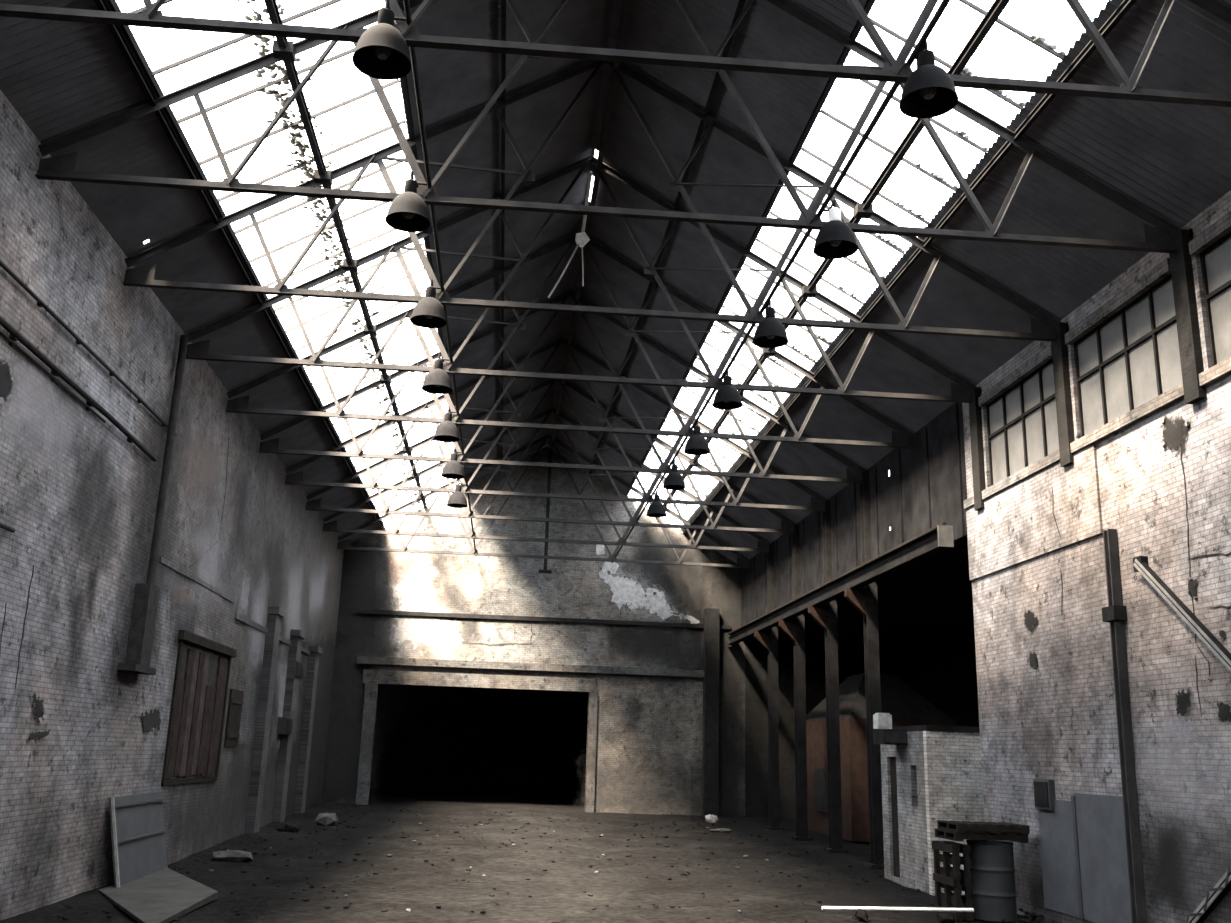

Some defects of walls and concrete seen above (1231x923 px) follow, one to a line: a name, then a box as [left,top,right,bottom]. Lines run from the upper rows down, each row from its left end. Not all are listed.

peeling [596,544,700,624]
crack [1180,446,1231,717]